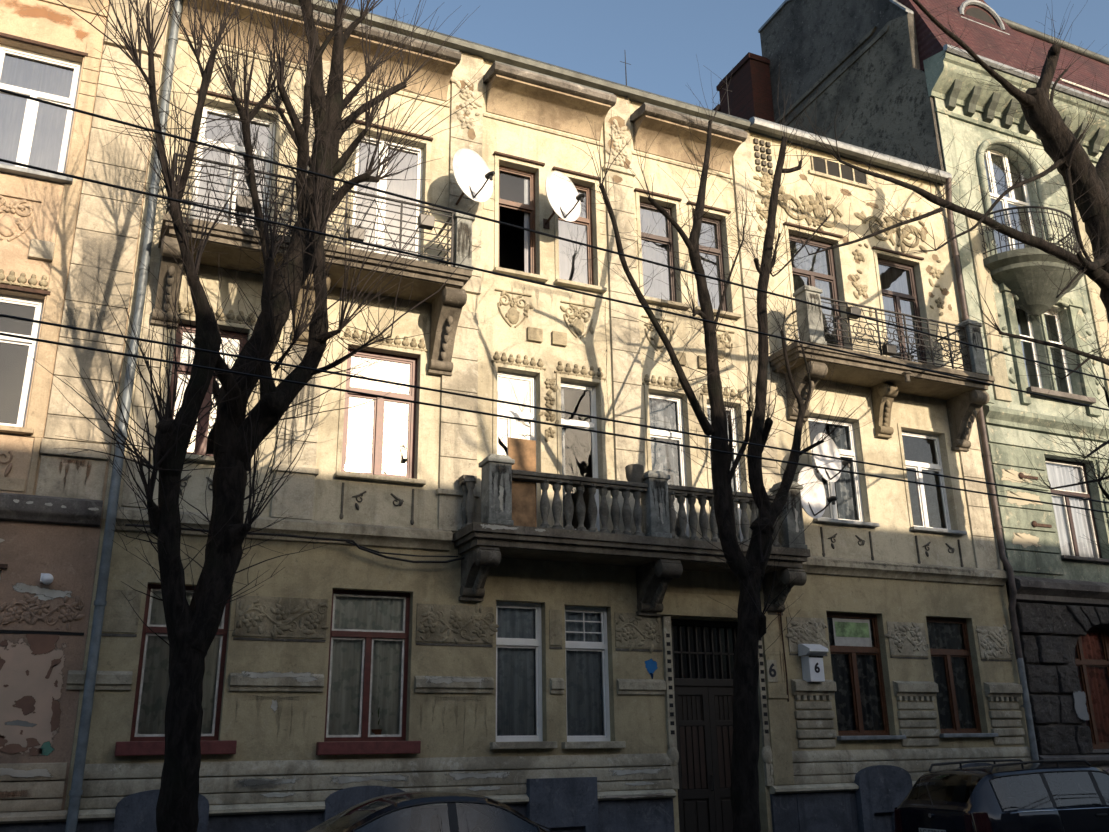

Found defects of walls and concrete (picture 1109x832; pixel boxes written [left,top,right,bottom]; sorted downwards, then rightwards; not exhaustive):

rust [59,459,90,486]
peeling [0,628,68,798]